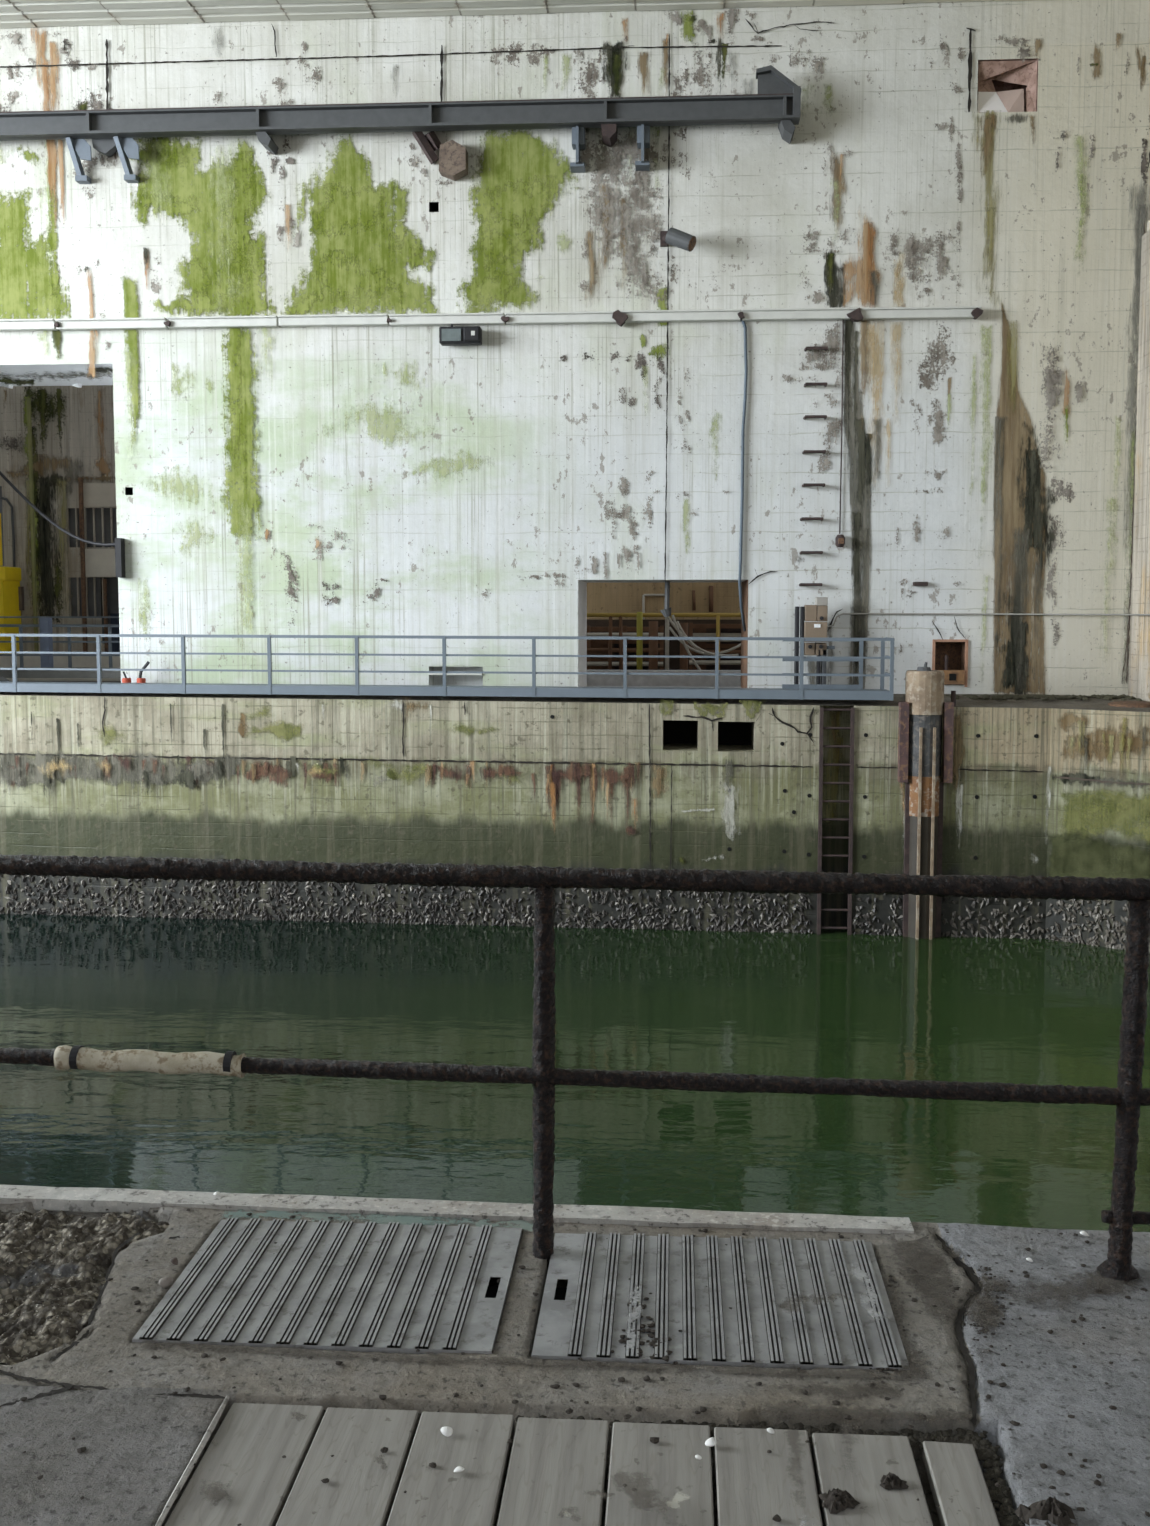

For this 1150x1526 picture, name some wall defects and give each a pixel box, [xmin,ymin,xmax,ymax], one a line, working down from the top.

corrosion [46,140,64,217]
corrosion [830,154,846,229]
corrosion [843,218,903,457]
leakage [1126,187,1146,557]
corrosion [425,761,666,836]
crack [0,1232,209,1407]
crack [156,1392,225,1400]
crack [935,1234,983,1425]